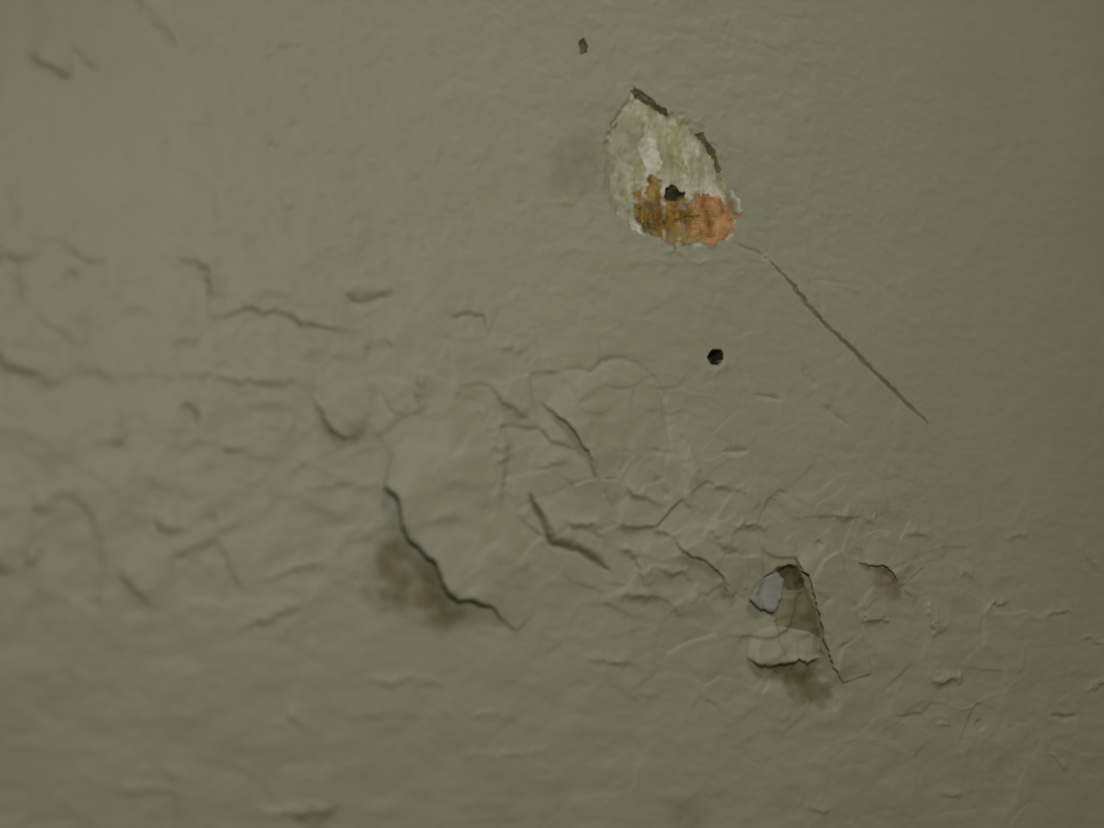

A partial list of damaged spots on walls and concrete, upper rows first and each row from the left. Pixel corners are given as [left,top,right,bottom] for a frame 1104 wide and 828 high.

spalling [589,86,742,276]
crack [733,240,929,425]
peeling [385,368,625,631]
crack [528,492,611,570]
spalling [747,503,953,713]